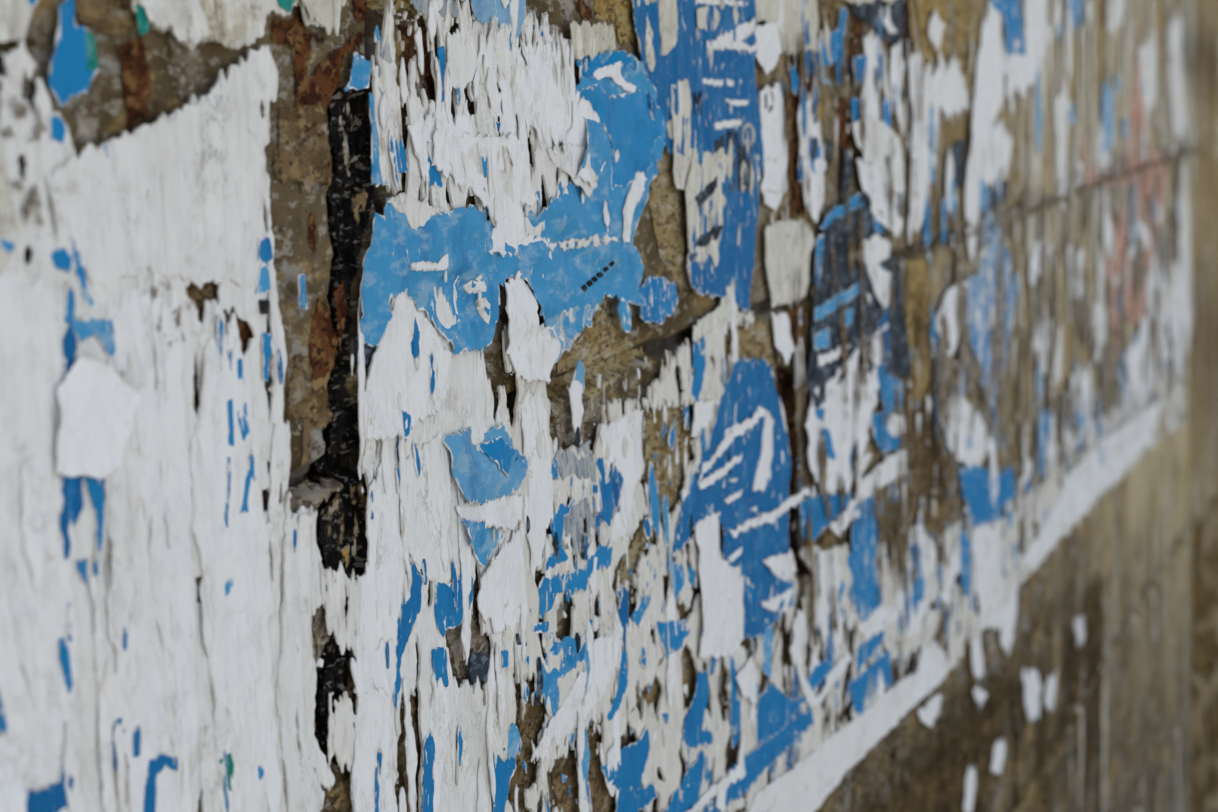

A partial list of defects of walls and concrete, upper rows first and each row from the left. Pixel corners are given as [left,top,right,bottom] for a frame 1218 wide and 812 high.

spalling [354,0,435,101]
spalling [574,0,636,46]
spalling [916,0,1003,71]
spalling [649,145,686,296]
crack [262,89,375,764]
spalling [546,310,655,447]
spalling [724,314,773,365]
spalling [614,405,692,589]
spalling [446,613,496,683]
spalling [398,696,421,812]
spalling [509,673,615,812]